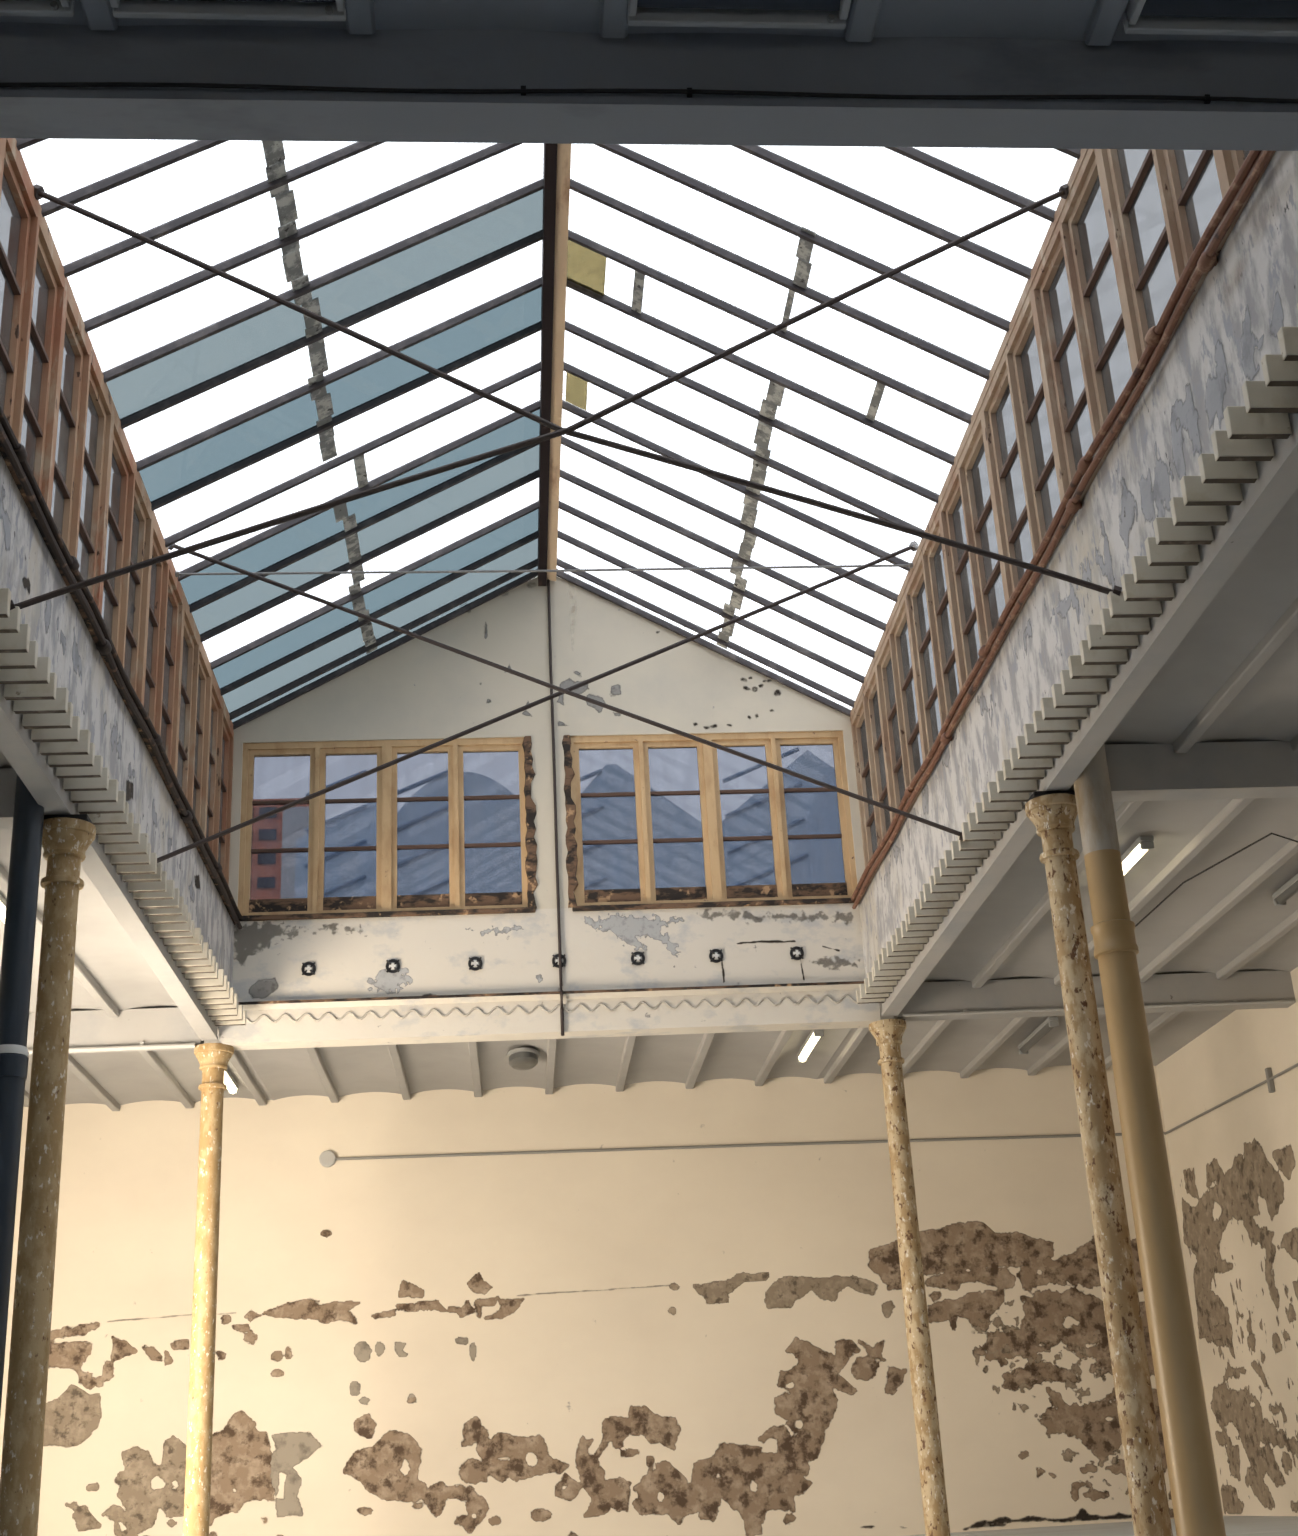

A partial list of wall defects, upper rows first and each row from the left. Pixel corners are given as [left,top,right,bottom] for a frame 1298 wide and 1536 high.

peeling [43,1322,189,1447]
spalling [65,1435,187,1536]
spalling [209,1410,321,1536]
peeling [271,1347,293,1377]
peeling [221,1272,525,1362]
spalling [343,1337,907,1536]
peeling [668,1240,902,1318]
peeling [919,1221,1129,1502]
peeling [1131,1239,1167,1473]
peeling [1182,1138,1298,1514]